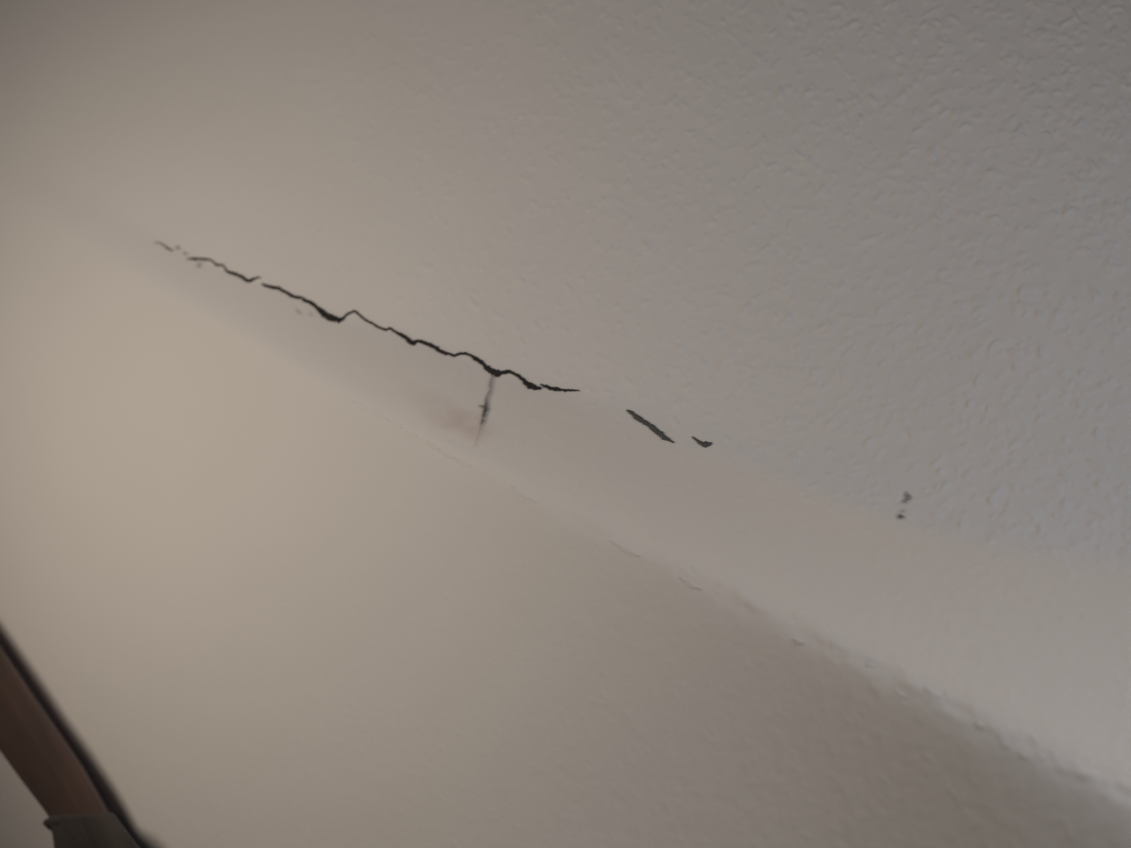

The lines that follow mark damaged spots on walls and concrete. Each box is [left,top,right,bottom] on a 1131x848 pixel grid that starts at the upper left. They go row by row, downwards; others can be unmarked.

crack [155,242,579,423]
crack [627,409,712,448]